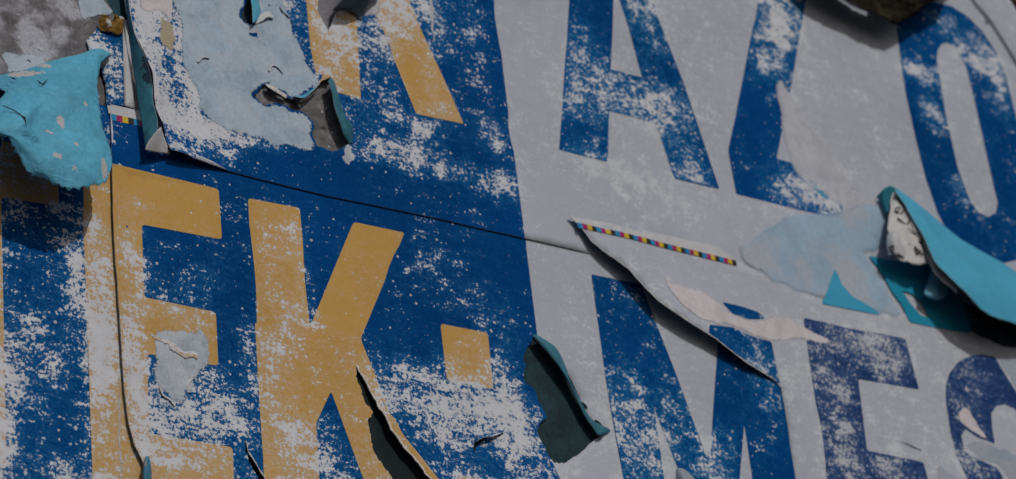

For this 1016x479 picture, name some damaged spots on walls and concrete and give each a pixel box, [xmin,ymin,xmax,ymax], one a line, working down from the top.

peeling [0,48,112,191]
peeling [140,0,319,150]
peeling [849,0,936,25]
peeling [741,81,1016,347]
peeling [149,327,210,406]
peeling [569,216,832,380]
peeling [959,407,988,439]
peeling [1001,360,1016,385]